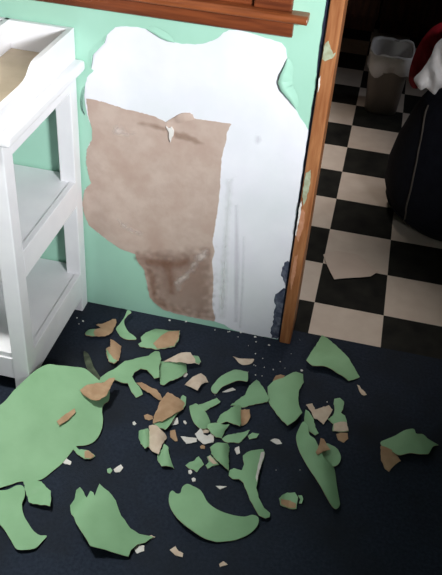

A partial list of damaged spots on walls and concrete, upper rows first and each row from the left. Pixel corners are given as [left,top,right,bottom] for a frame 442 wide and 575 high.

peeling [80,26,309,339]